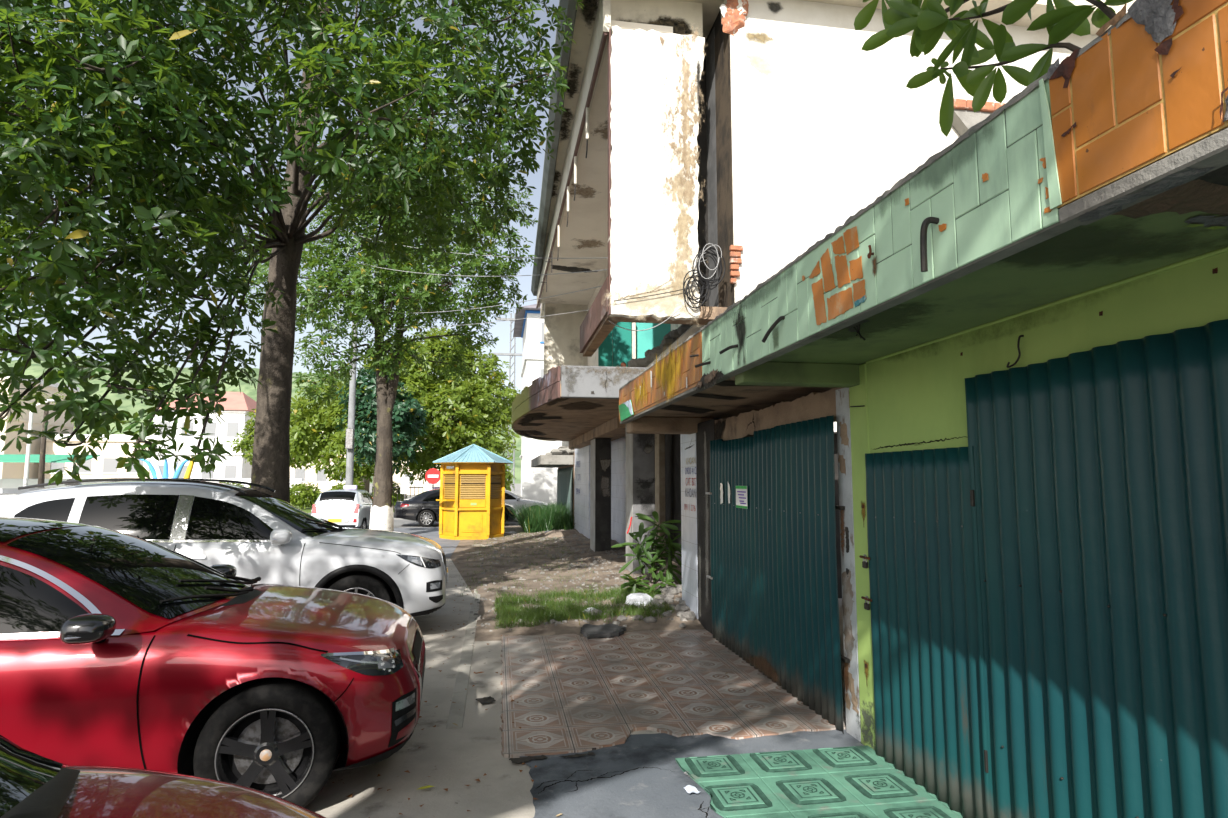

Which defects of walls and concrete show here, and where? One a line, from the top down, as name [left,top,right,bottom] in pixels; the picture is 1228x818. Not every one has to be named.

damp [582,0,599,25]
spalling [720,0,749,36]
spalling [1096,0,1184,55]
spalling [1220,87,1228,122]
damp [997,225,1208,266]
peeling [802,226,866,325]
damp [519,367,643,439]